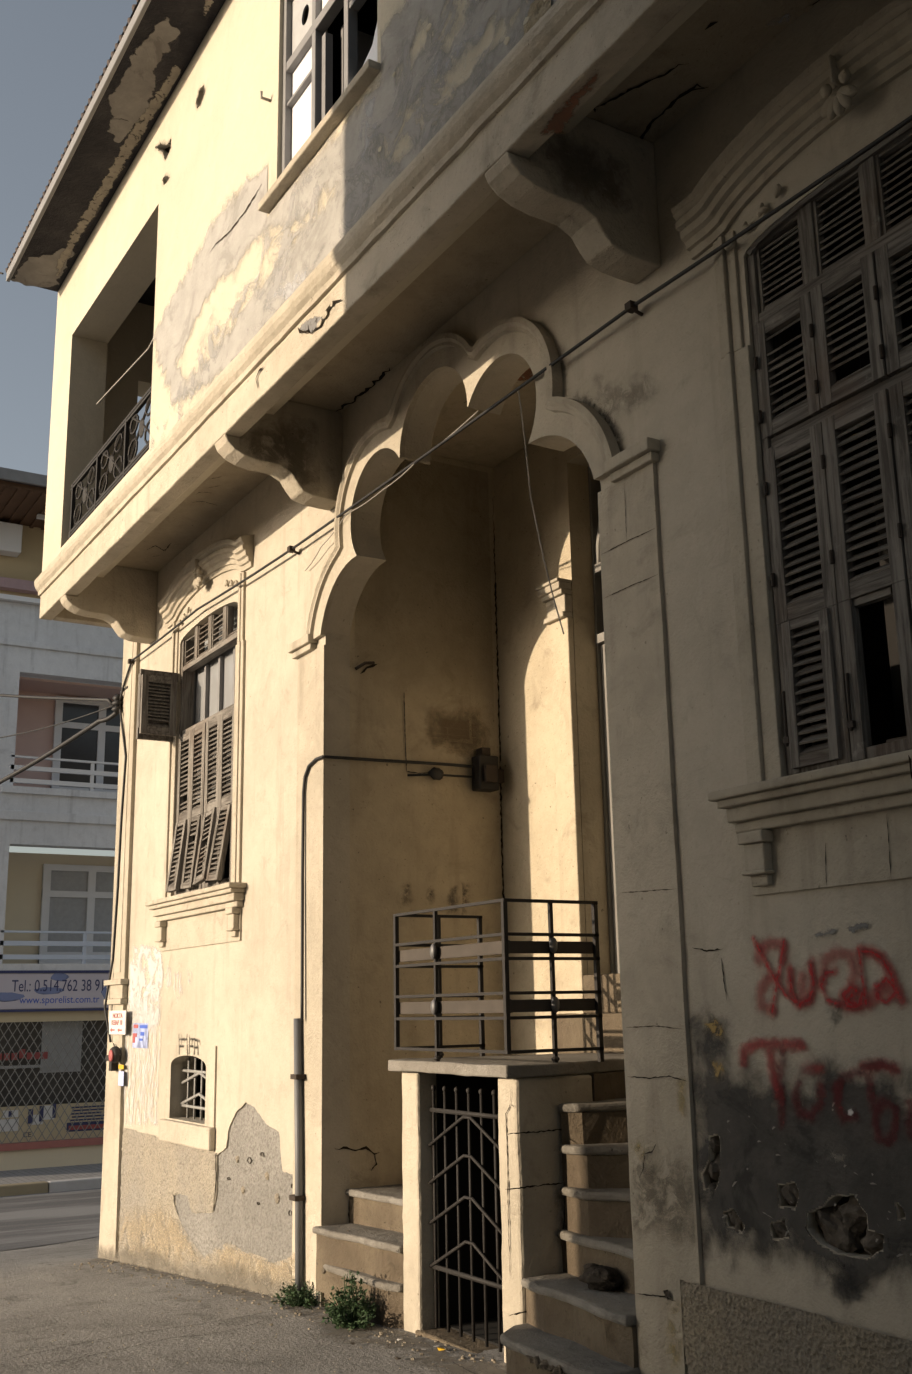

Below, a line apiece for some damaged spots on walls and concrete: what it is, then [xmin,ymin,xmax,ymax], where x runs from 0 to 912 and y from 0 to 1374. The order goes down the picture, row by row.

crack [593,64,708,139]
crack [210,184,262,252]
peeling [153,0,557,421]
flaking render [175,1103,293,1270]
water stain [635,1017,912,1302]
flaking render [805,1195,884,1260]